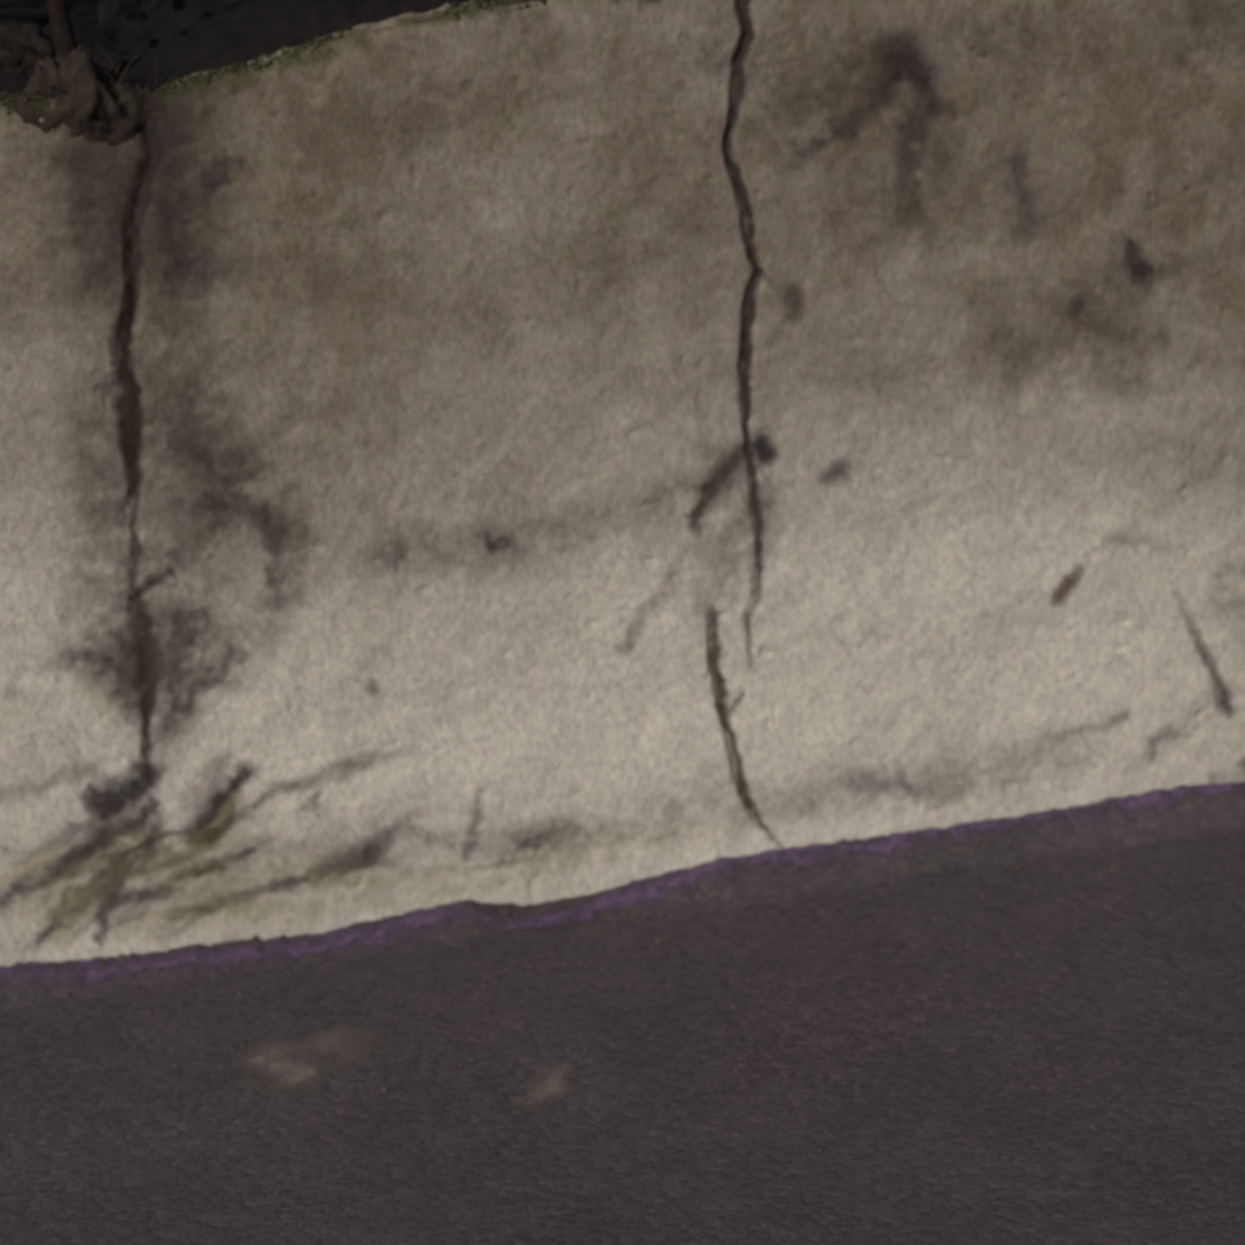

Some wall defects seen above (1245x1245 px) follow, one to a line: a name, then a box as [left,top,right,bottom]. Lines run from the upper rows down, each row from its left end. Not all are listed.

crack [117,119,163,504]
crack [723,0,763,598]
crack [130,546,162,786]
crack [709,608,768,831]
crack [1197,641,1233,715]
leakage [10,849,68,895]